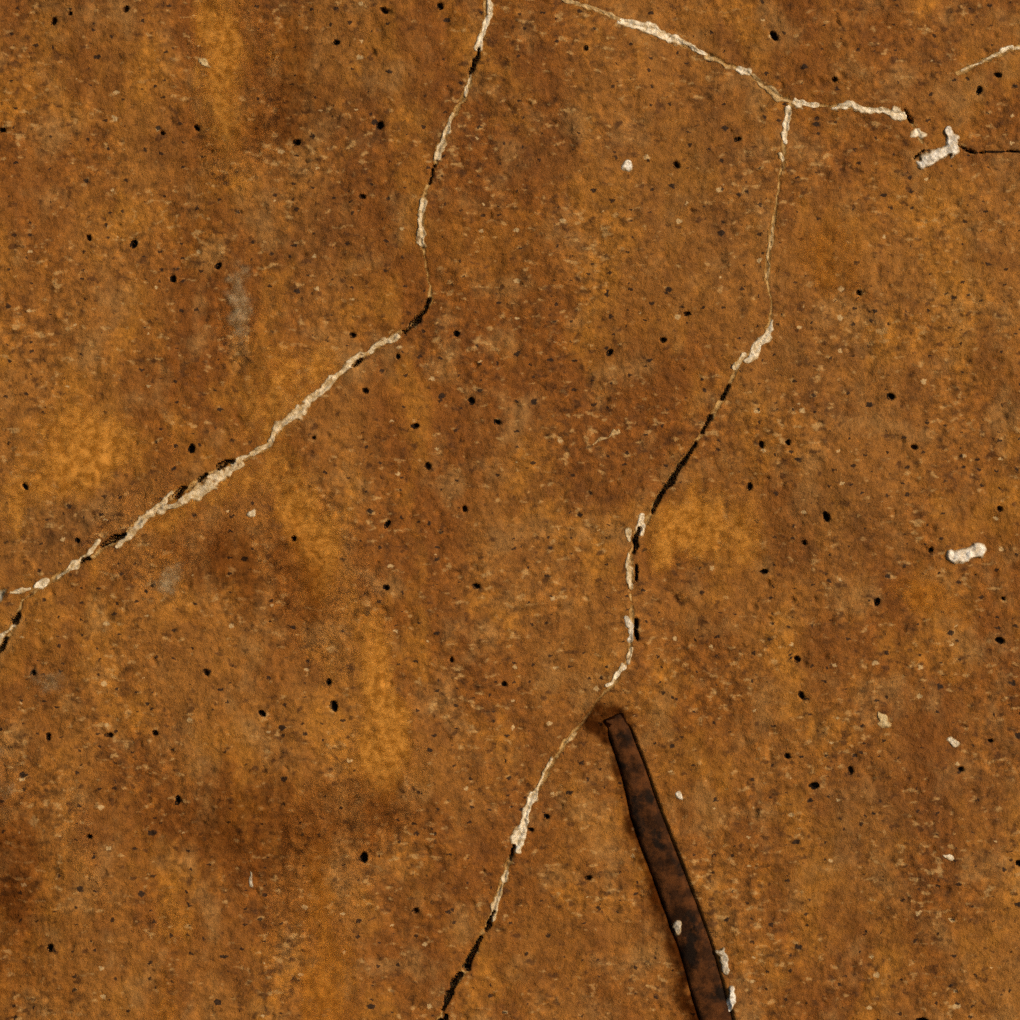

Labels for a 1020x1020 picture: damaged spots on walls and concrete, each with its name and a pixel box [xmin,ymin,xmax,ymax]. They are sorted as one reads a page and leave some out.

crack [955,43,1020,76]
crack [958,145,1020,154]
crack [0,0,494,652]
crack [436,0,927,1020]
corrosion [585,704,733,1020]